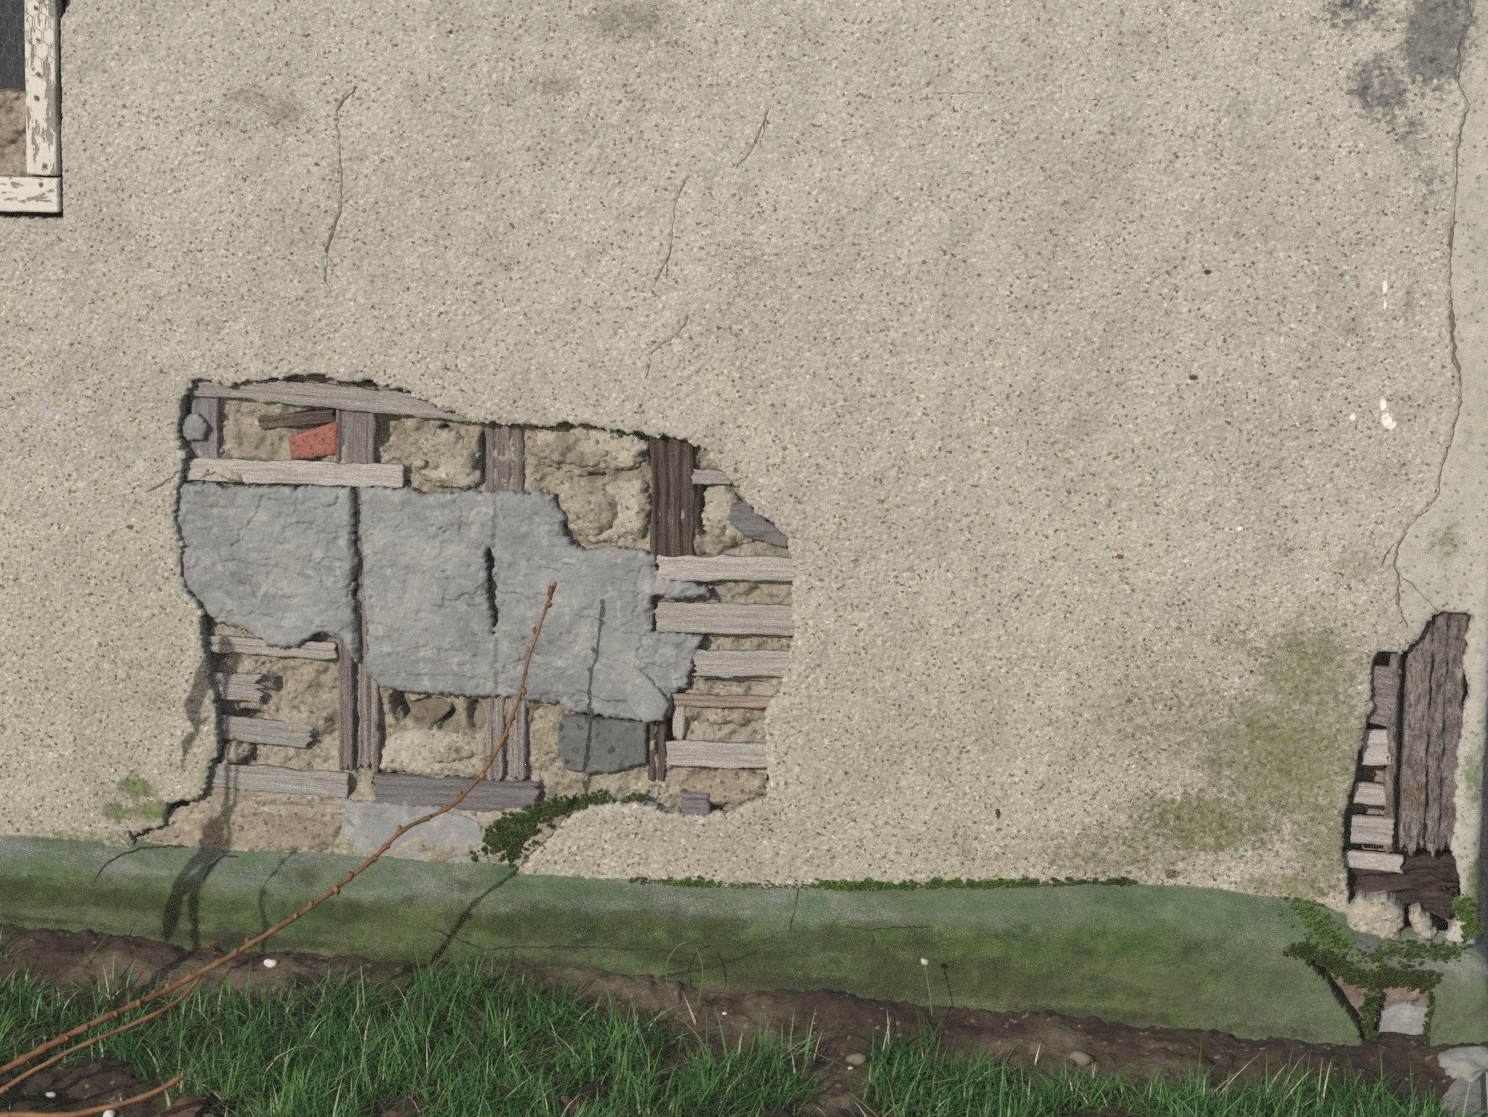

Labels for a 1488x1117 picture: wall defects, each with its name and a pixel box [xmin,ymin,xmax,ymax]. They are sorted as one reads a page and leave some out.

damp [1332,0,1382,27]
damp [1342,0,1477,147]
crack [324,86,357,297]
crack [1381,0,1472,627]
spalling [137,374,795,867]
spalling [1343,611,1471,940]
spalling [1477,712,1488,937]